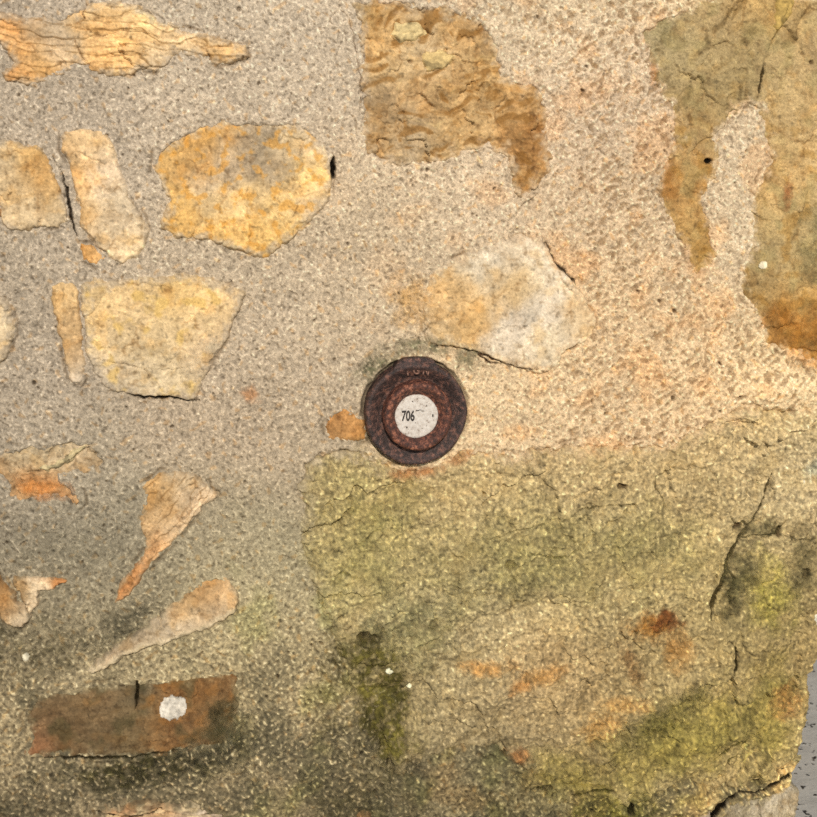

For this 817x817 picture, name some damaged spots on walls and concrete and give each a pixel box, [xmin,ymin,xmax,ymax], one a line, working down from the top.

crack [58,166,77,233]
crack [546,243,574,281]
crack [709,473,781,618]